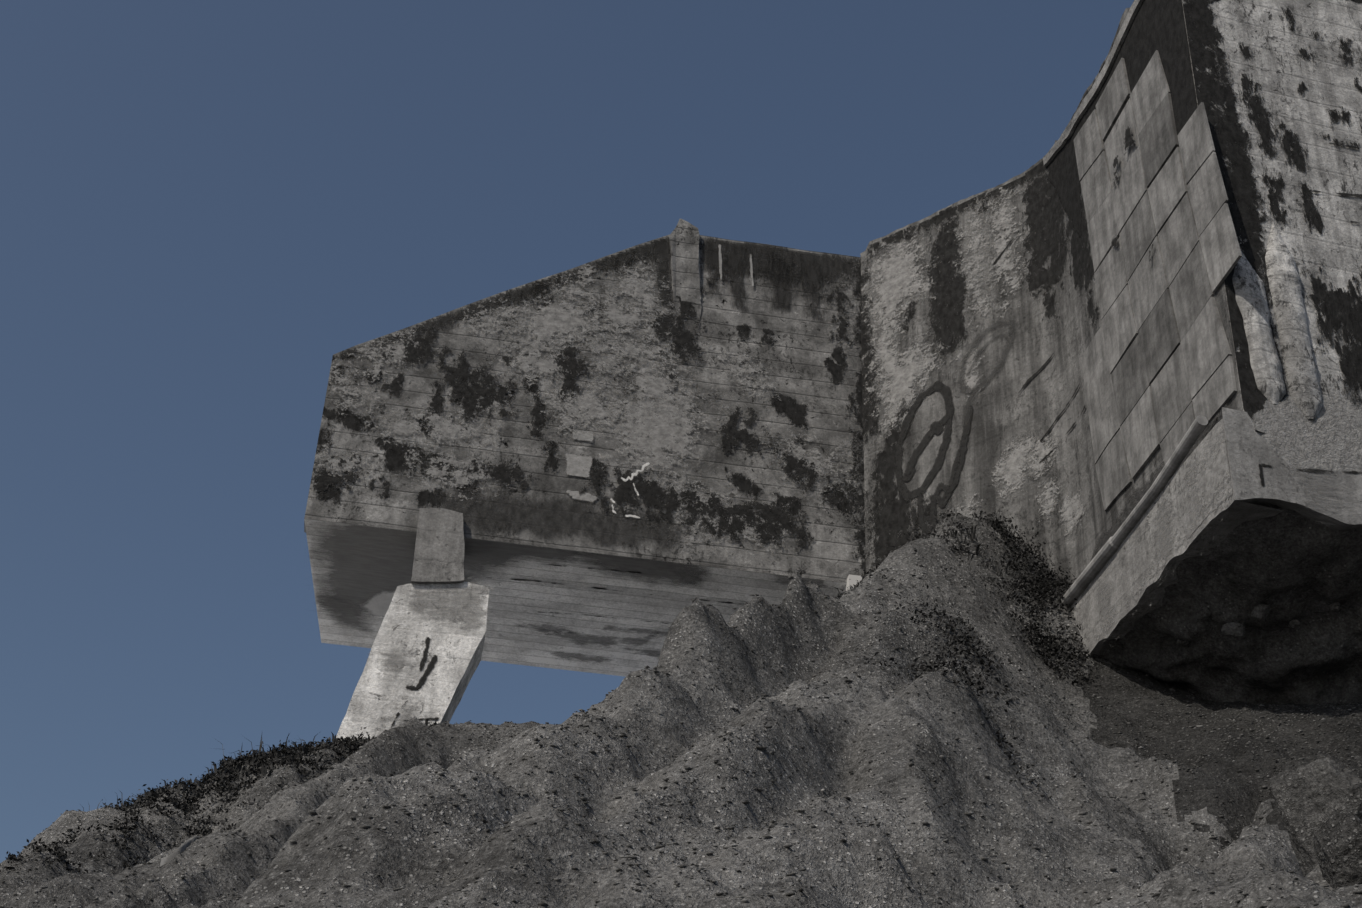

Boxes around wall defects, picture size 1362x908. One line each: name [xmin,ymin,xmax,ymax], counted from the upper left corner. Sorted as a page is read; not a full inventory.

damp [698,161,1049,578]
crack [1259,464,1362,486]
damp [314,489,706,631]